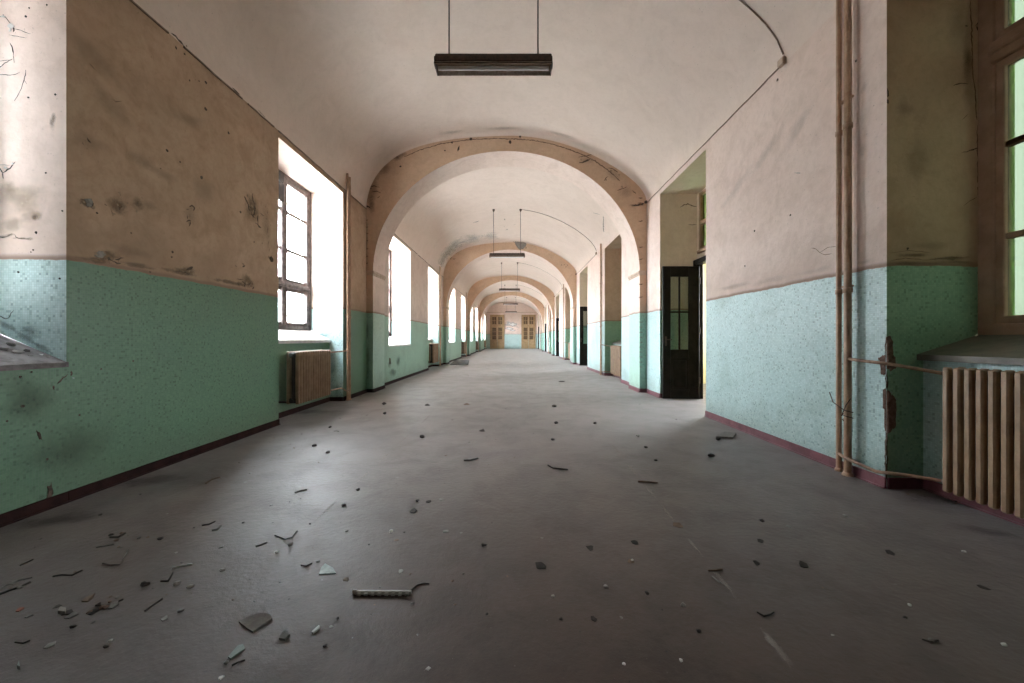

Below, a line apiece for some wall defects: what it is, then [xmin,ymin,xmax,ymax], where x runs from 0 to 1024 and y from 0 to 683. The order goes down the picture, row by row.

crack [0,15,29,101]
spalling [877,336,898,479]